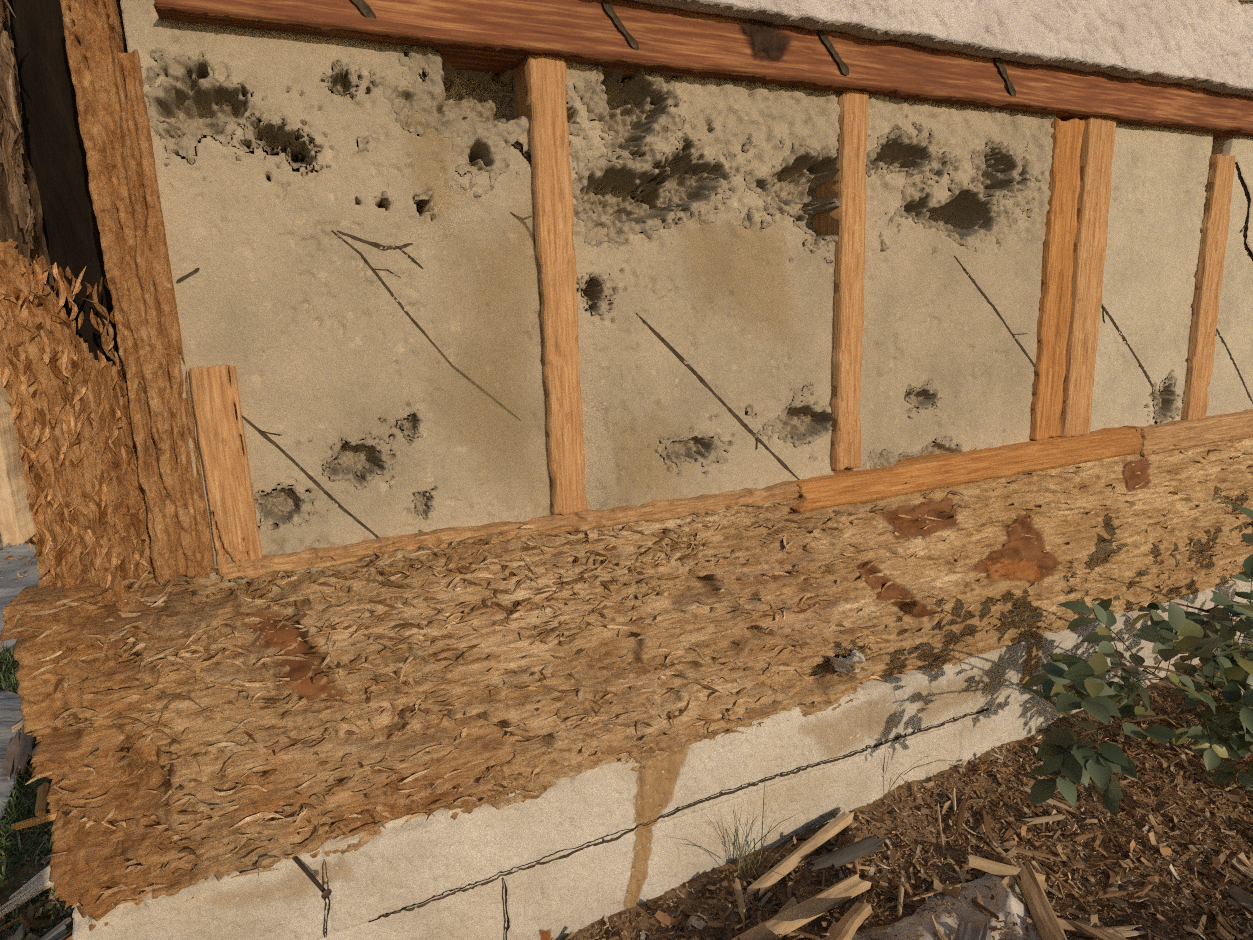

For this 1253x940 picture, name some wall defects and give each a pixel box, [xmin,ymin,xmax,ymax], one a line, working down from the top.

spalling [132,51,329,177]
spalling [319,45,531,198]
spalling [566,65,841,262]
spalling [866,124,1042,254]
crack [1235,162,1253,261]
spalling [576,272,616,320]
spalling [319,409,424,490]
spalling [648,429,733,475]
spalling [747,383,833,460]
spalling [1145,370,1185,425]
spalling [253,479,334,530]
damp [624,822,654,909]